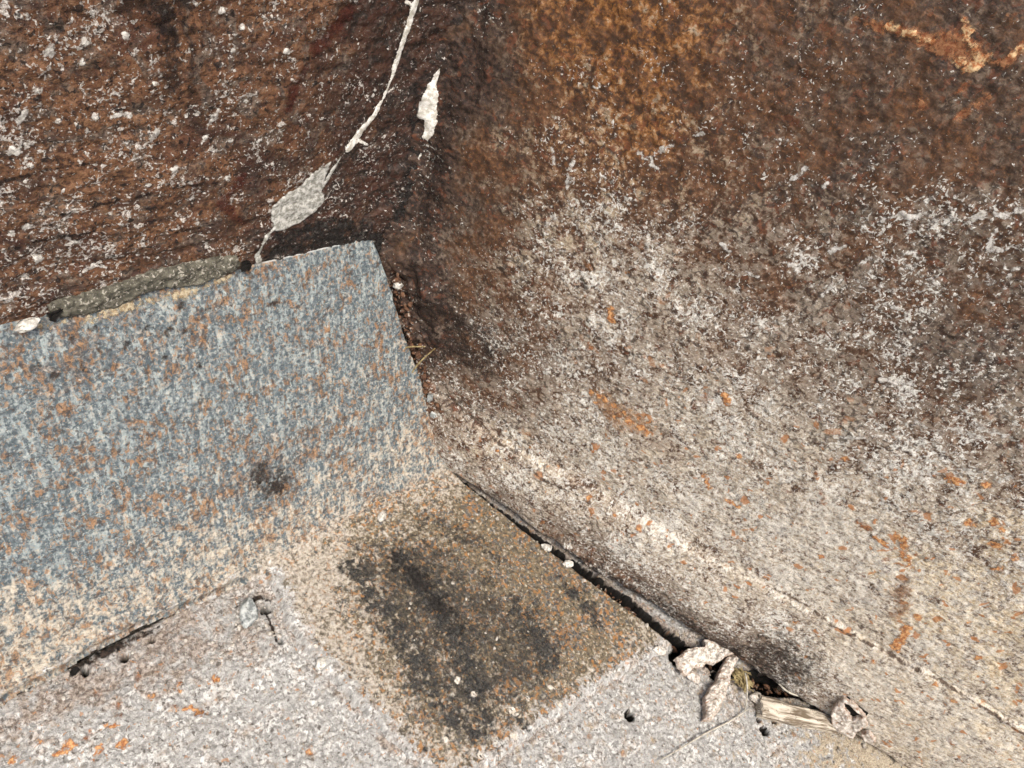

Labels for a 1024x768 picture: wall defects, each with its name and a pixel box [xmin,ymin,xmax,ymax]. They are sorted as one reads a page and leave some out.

corrosion [852,16,1024,94]
peeling [92,112,133,121]
peeling [6,146,33,168]
crack [457,476,800,699]
leakage [338,548,493,745]
peeling [673,639,747,722]
peeling [831,695,876,745]